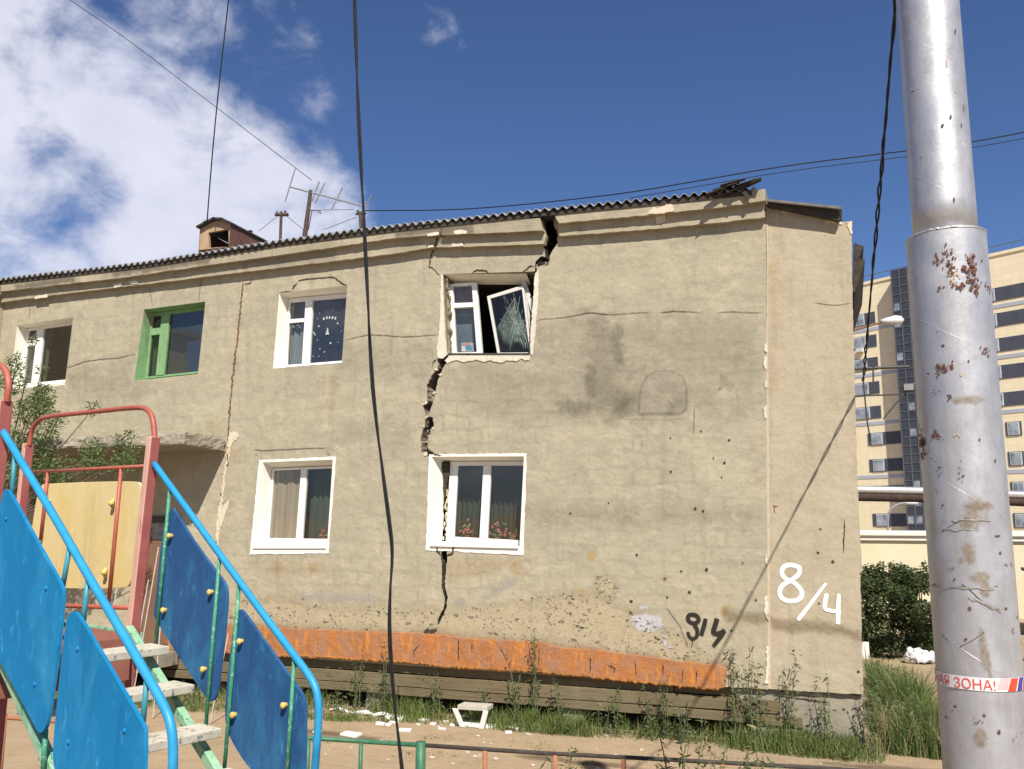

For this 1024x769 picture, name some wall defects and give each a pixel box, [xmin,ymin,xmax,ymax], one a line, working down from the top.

crack [522,209,558,278]
rust [933,243,991,295]
crack [227,279,251,440]
crack [537,310,764,321]
rust [927,360,962,376]
spalling [15,431,239,558]
crack [413,546,473,660]
flaking render [228,574,713,664]